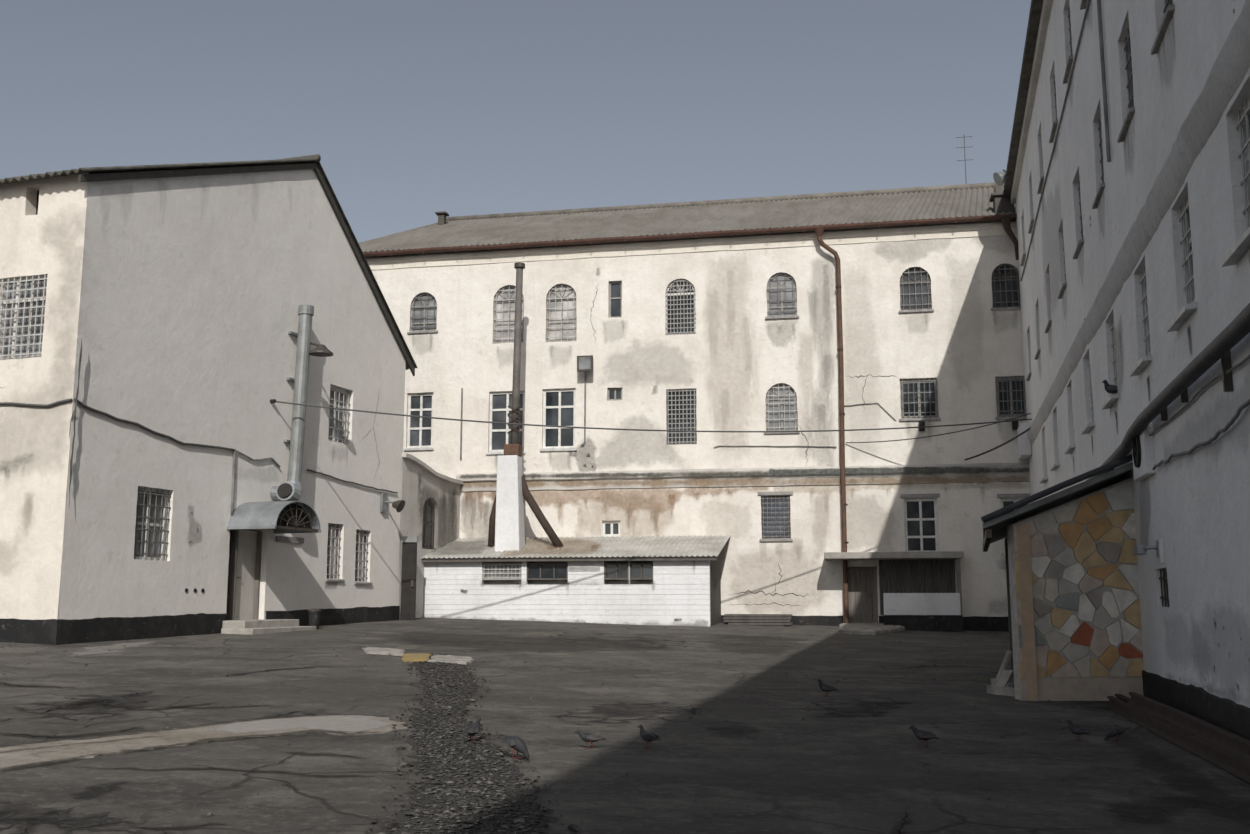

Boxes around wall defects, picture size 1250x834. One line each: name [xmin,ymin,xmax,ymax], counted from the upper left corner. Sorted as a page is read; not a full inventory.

crack [730,563,809,607]